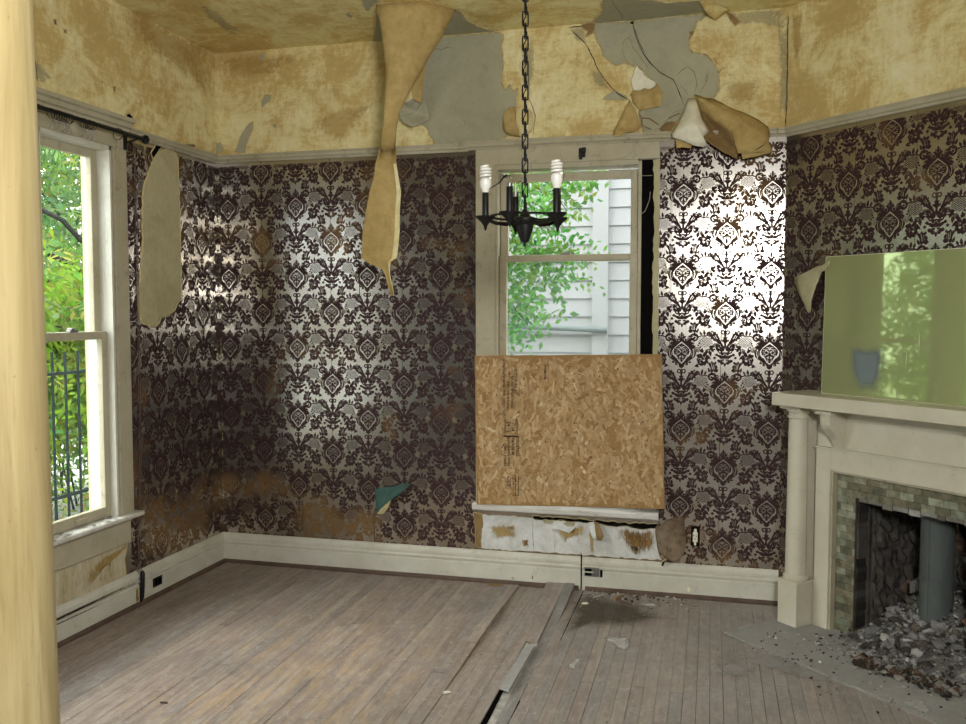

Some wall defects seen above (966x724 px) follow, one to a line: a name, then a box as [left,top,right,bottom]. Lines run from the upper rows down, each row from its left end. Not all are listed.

crack [569,26,627,99]
peeling [581,0,720,132]
crack [612,2,735,105]
peeling [137,145,182,327]
flaking render [55,544,128,607]
flaking render [481,514,666,566]